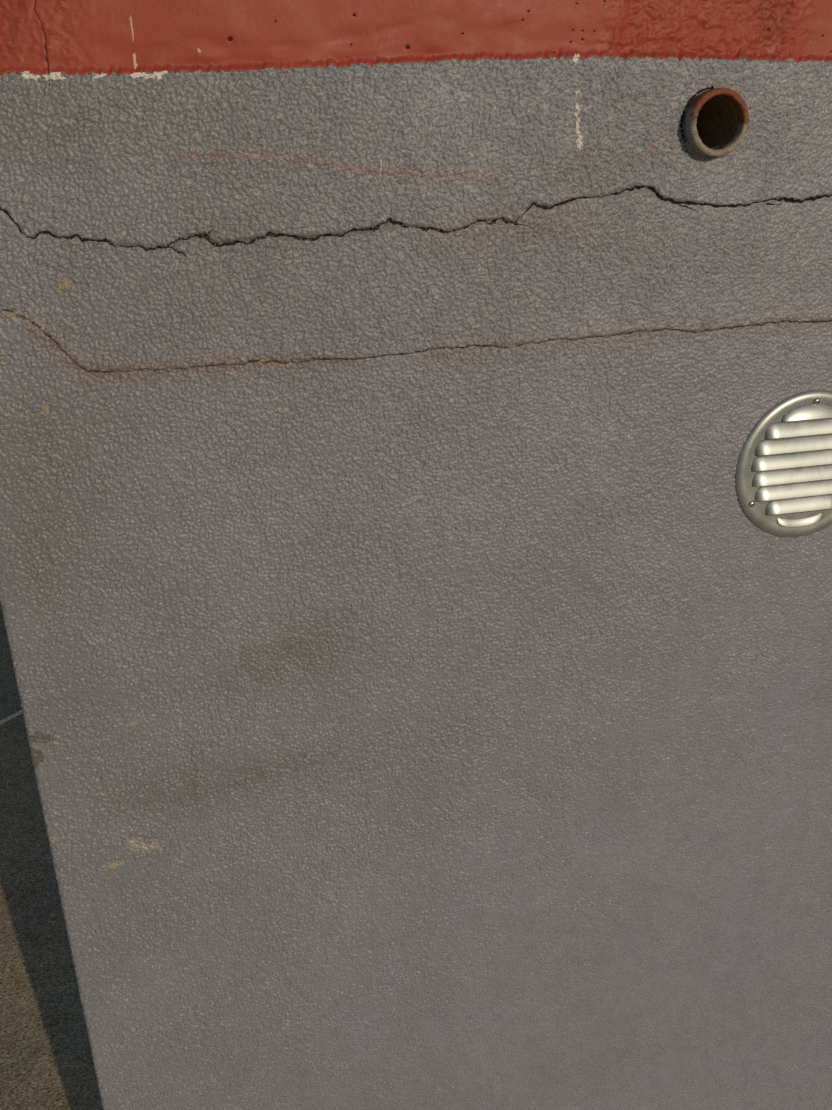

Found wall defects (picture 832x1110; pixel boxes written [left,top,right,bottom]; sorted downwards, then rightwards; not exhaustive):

crack [0,185,832,258]
crack [0,306,832,390]